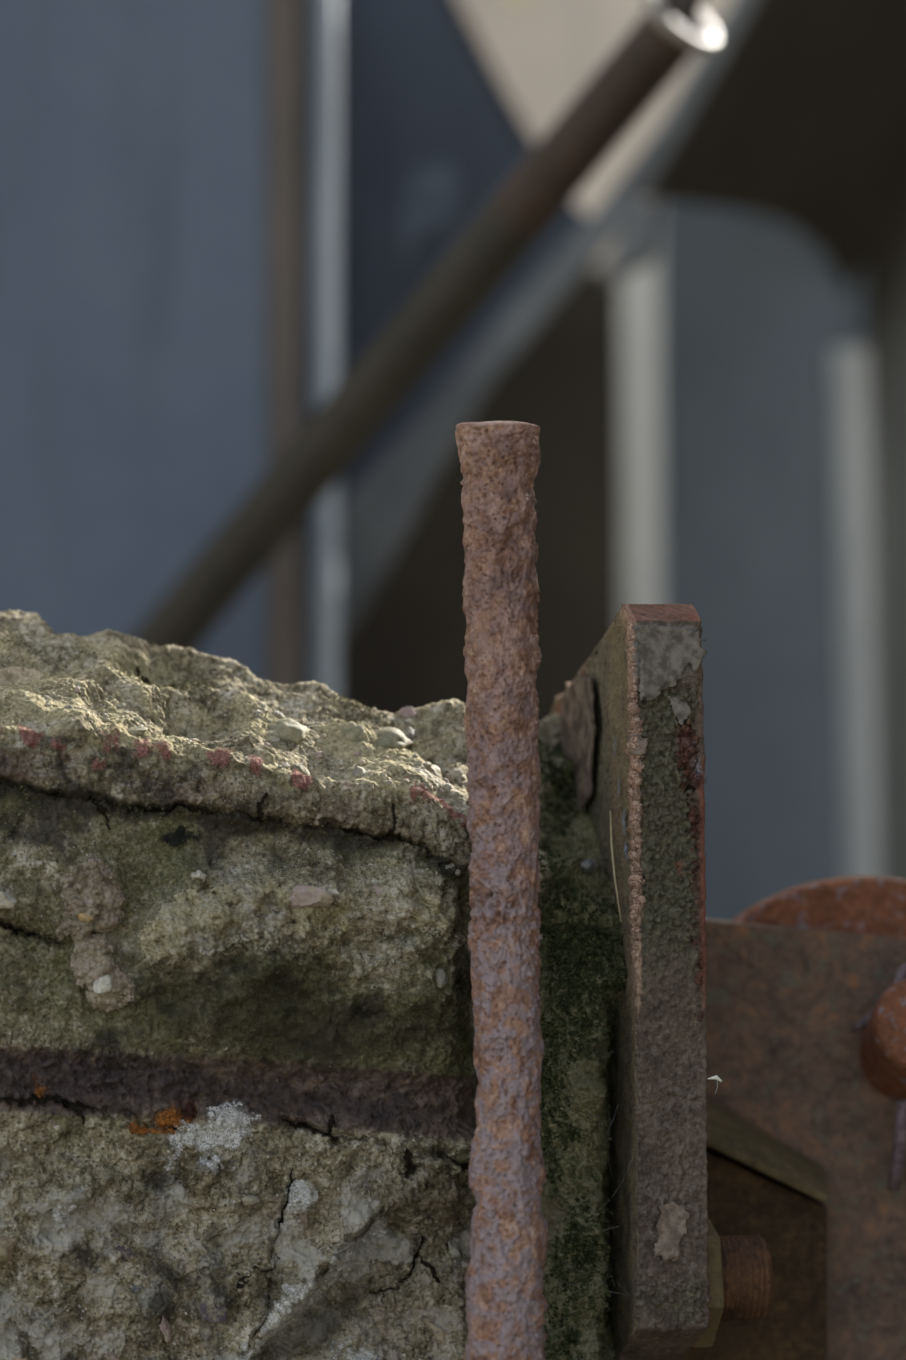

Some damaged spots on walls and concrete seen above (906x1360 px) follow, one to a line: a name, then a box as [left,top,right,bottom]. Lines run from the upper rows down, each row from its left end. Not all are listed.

crack [1,784,430,854]
corrosion [128,1100,197,1152]
crack [235,1170,293,1345]
crack [371,1236,440,1293]